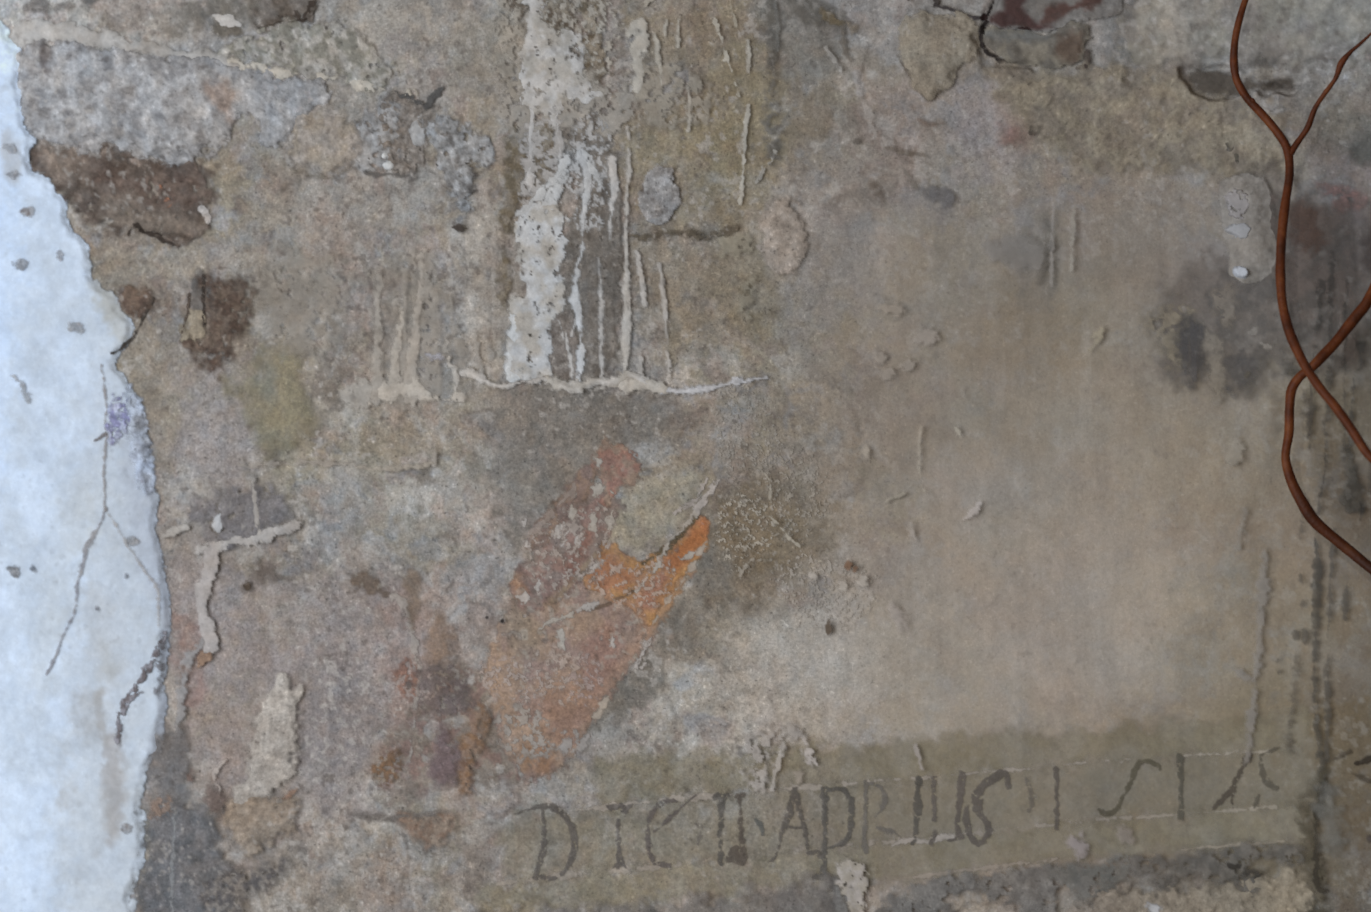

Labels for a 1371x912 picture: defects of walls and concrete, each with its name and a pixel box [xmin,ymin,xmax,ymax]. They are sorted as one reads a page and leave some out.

spalling [23,0,96,12]
crack [908,0,980,20]
spalling [3,142,218,248]
water stain [368,0,768,410]
spalling [68,323,84,333]
spalling [178,270,255,381]
water stain [225,255,347,449]
peeling [105,384,155,495]
crack [46,296,167,744]
water stain [1293,539,1348,912]
peeling [835,860,868,912]
spalling [1066,867,1313,912]